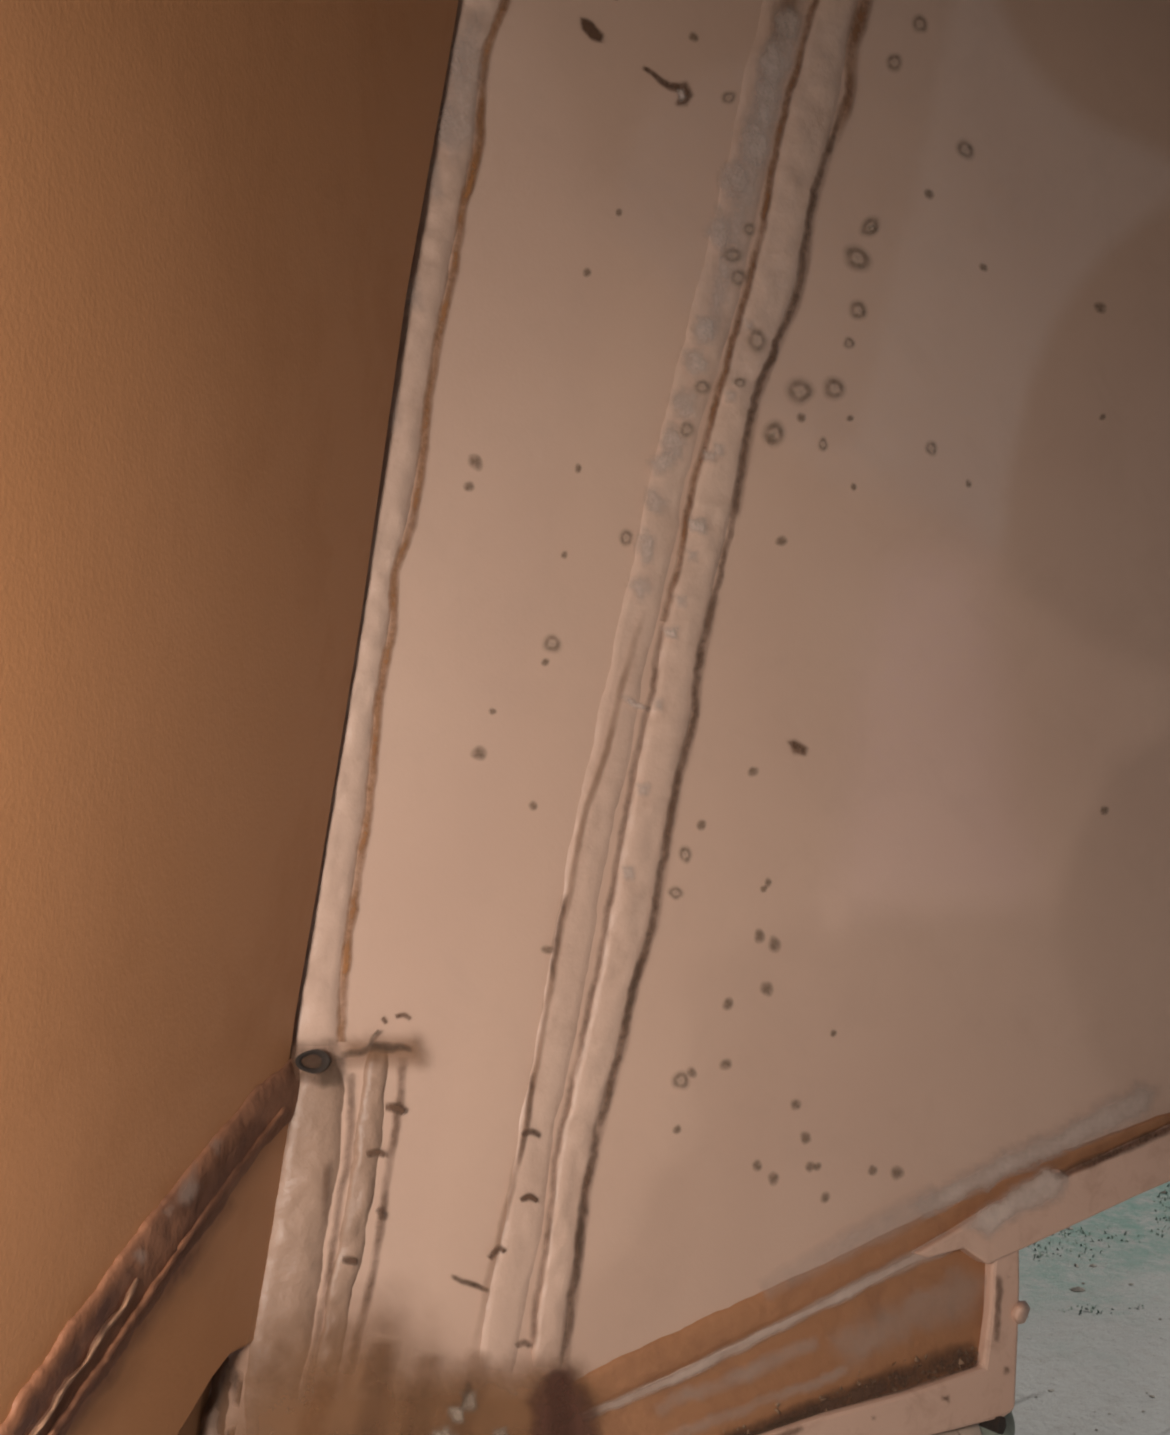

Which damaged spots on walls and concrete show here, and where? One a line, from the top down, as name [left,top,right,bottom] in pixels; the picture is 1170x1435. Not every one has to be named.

crack [599,124,837,1120]
crack [568,1158,594,1325]